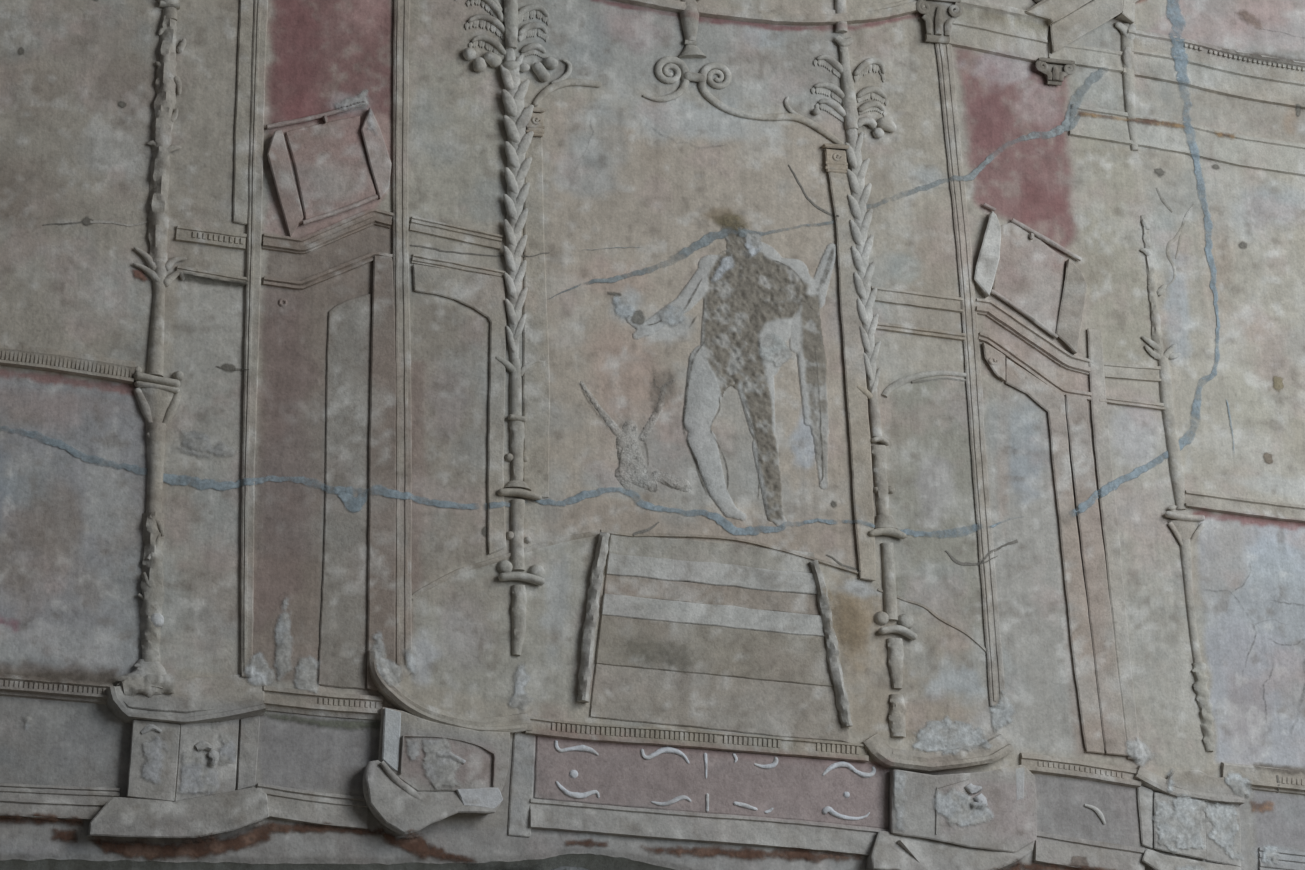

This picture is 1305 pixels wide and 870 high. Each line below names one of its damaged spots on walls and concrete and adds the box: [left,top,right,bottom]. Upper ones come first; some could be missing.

flaking render [745,233,762,256]
flaking render [712,254,734,281]
spalling [245,599,319,693]
spalling [913,691,1014,755]
spalling [407,738,463,790]
spalling [1127,738,1155,766]
spalling [1153,769,1251,870]
corrosion [0,813,476,862]
corrosion [566,839,607,847]
corrosion [649,846,861,862]
corrosion [998,861,1107,870]
flaking render [1262,846,1279,866]